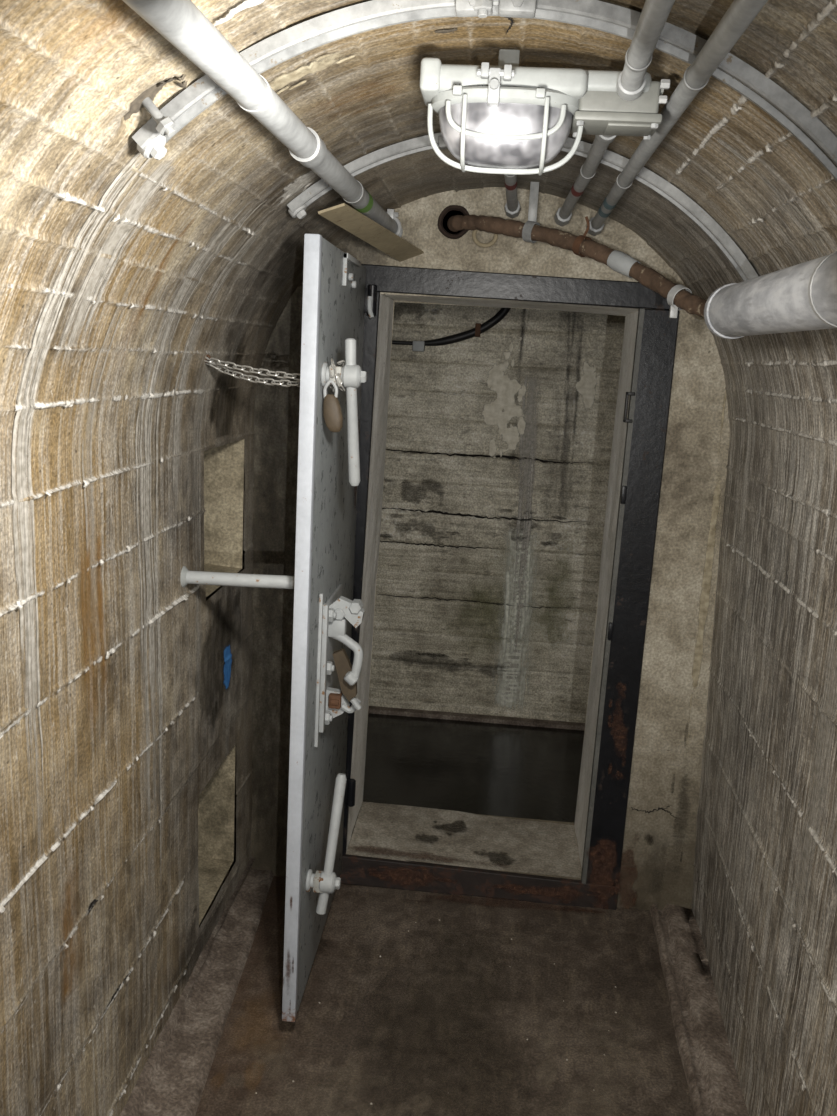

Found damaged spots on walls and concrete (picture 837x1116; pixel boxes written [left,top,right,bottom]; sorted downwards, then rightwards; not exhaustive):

efflorescence [765,0,837,78]
efflorescence [675,95,837,256]
peeling [482,337,526,459]
efflorescence [741,359,837,367]
efflorescence [496,377,536,708]
efflorescence [725,461,837,1015]